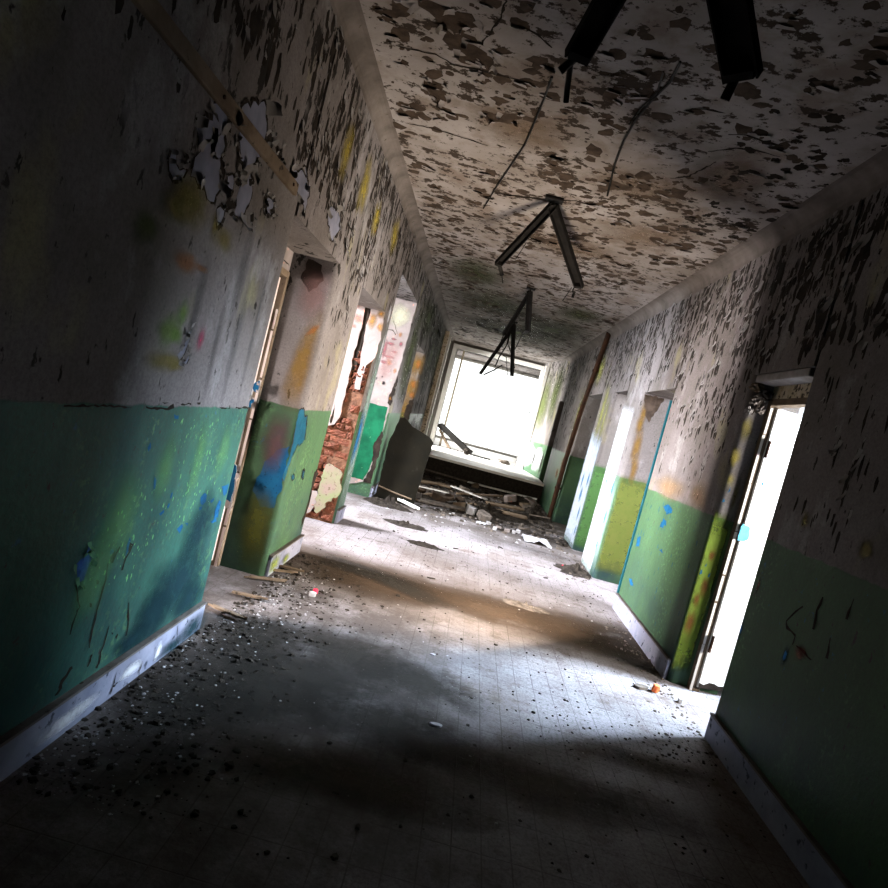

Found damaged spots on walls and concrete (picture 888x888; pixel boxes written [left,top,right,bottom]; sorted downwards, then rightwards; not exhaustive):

peeling [141,381,260,533]